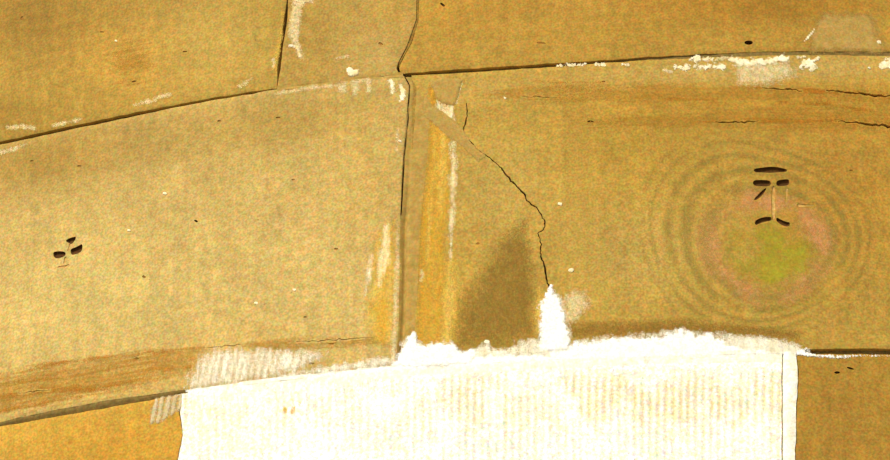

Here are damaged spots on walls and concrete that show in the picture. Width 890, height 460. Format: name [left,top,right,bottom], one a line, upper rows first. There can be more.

leakage [416,120,540,352]
crack [499,167,550,288]
leakage [568,131,884,345]